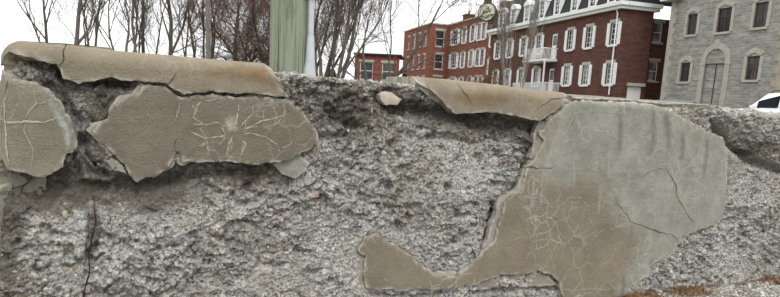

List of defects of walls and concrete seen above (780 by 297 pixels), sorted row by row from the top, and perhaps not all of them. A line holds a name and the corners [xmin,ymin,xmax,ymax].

crack [0,79,64,168]
crack [120,75,296,150]
crack [83,196,96,297]
spalling [0,59,539,297]
peeling [357,99,780,297]